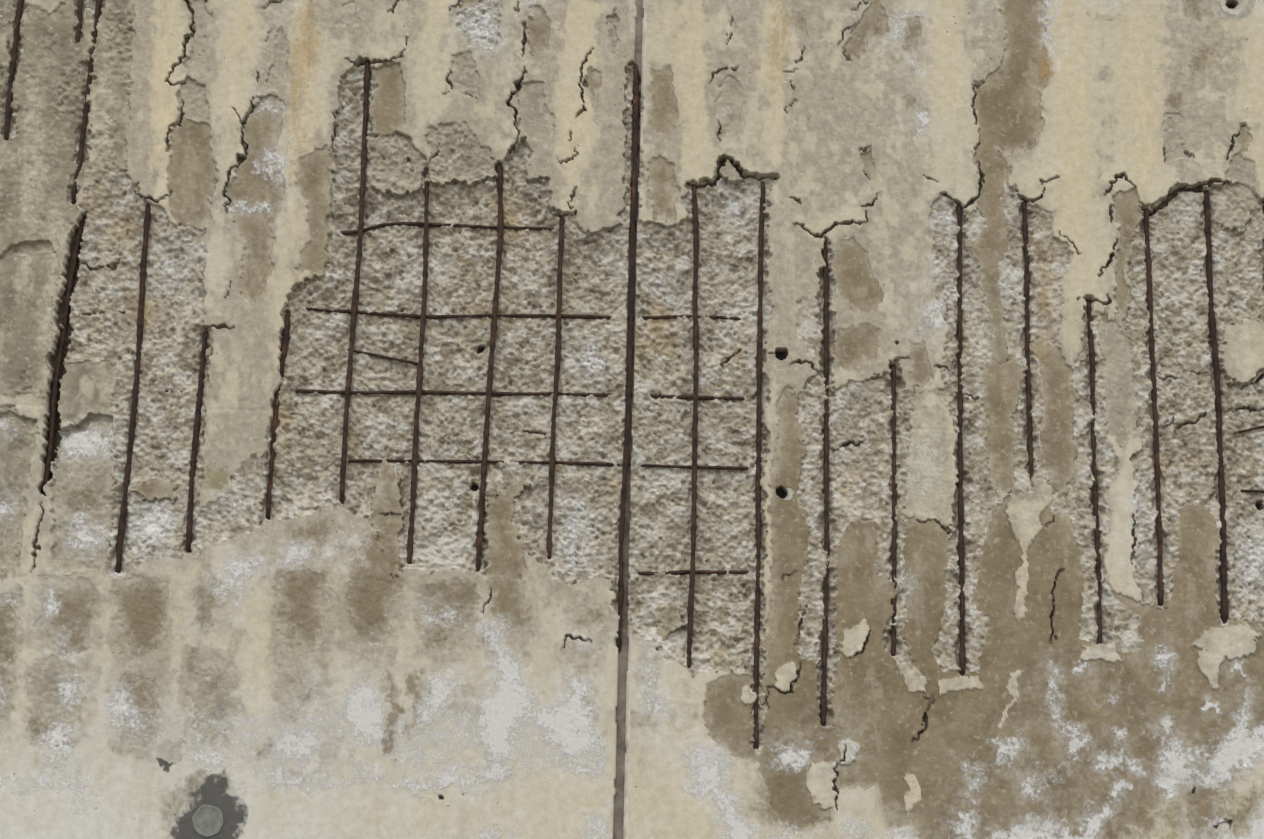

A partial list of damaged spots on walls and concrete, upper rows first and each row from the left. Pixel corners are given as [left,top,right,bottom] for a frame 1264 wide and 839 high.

crack [165,0,208,152]
crack [224,71,261,214]
crack [443,2,528,159]
crack [551,48,594,218]
crack [686,121,879,239]
crack [784,47,806,113]
peeling [628,0,1264,839]
water stain [198,547,264,627]
water stain [0,671,88,815]
water stain [101,581,607,797]
water stain [948,660,1264,839]
water stain [1154,645,1176,692]